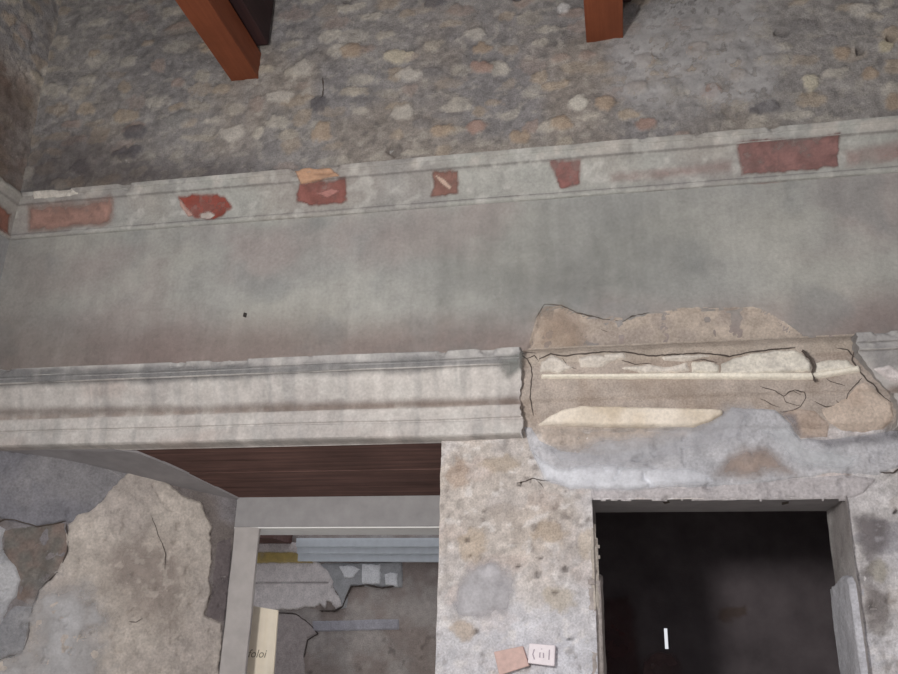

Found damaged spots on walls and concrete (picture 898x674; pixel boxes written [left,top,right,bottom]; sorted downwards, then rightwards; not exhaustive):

spalling [529,306,853,374]
crack [522,304,889,416]
flaking render [874,365,898,383]
spalling [783,383,893,438]
peeling [0,474,231,674]